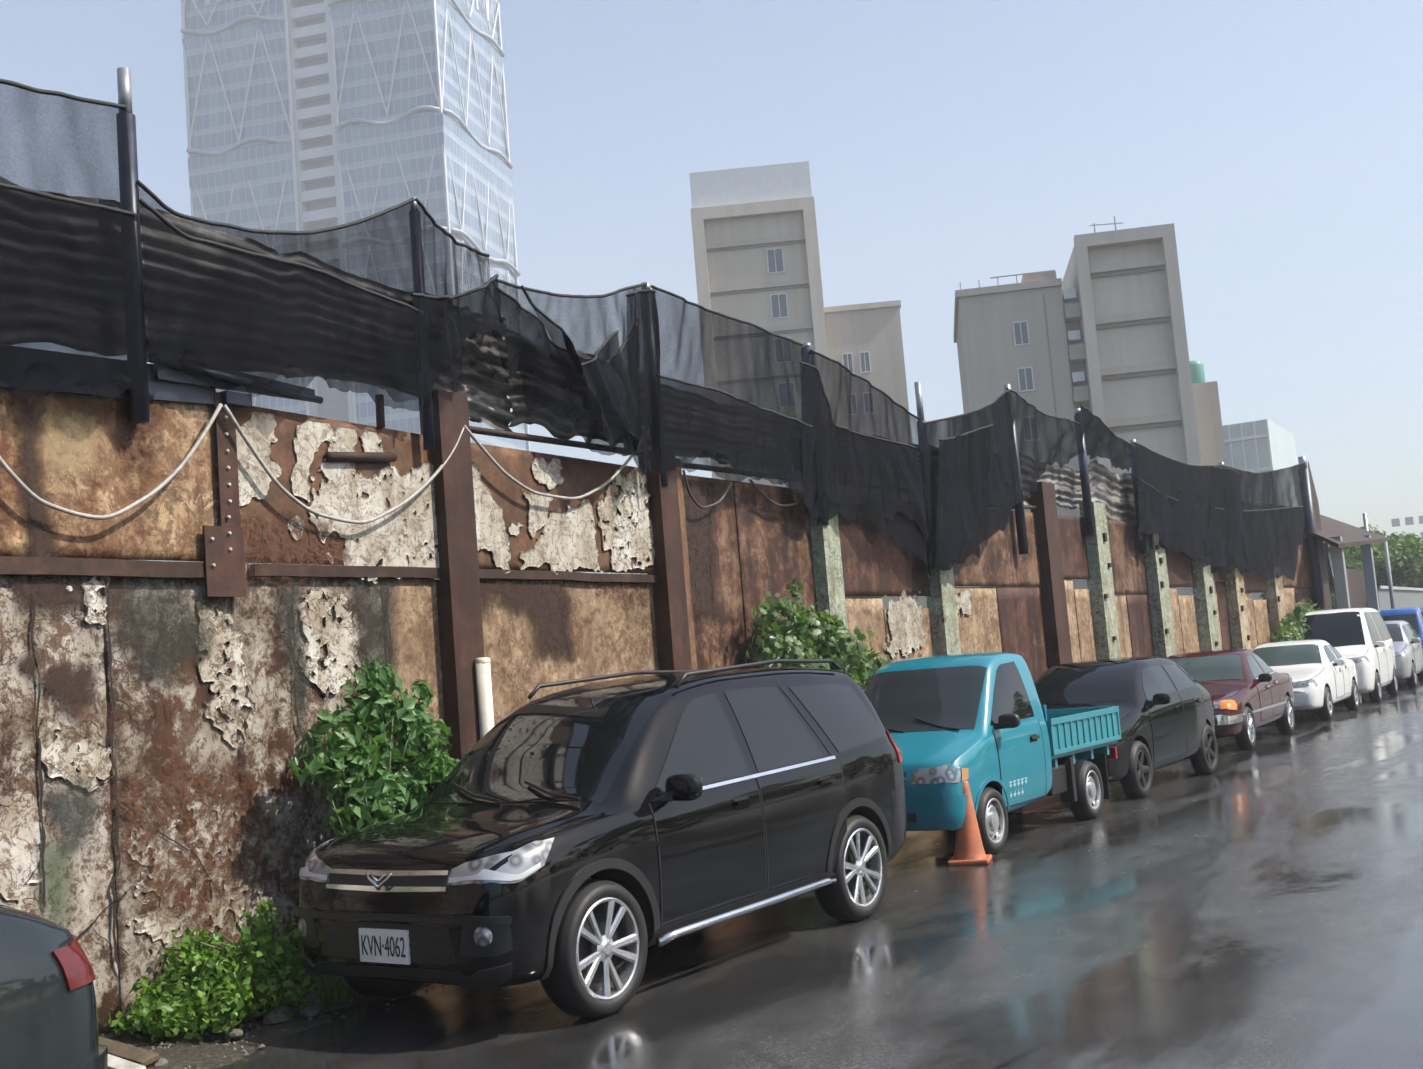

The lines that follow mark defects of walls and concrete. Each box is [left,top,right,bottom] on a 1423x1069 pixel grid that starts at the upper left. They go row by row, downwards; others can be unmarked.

crack [20,591,63,908]
corrosion [12,575,87,609]
peeling [38,717,114,792]
corrosion [0,648,236,743]
crack [77,577,222,978]
leakage [115,583,209,679]
peeling [294,587,361,698]
peeling [236,412,440,584]
peeling [472,457,655,574]
corrosion [682,479,716,617]
peeling [0,791,47,912]
corrosion [108,751,276,930]